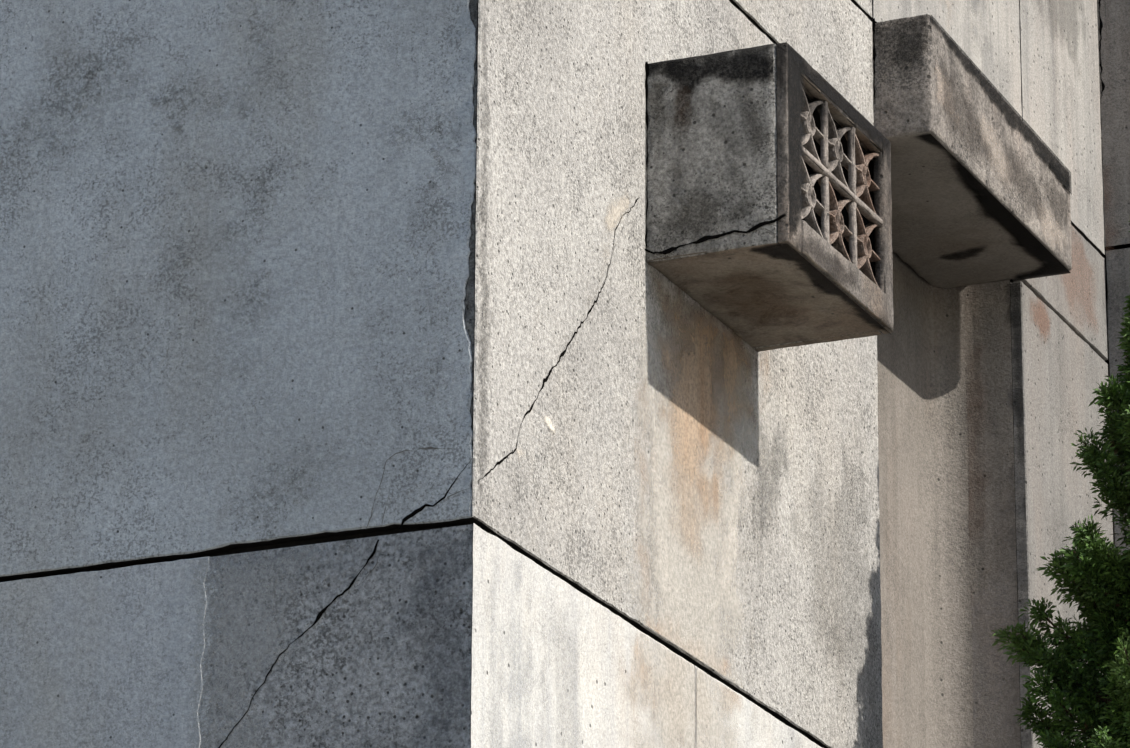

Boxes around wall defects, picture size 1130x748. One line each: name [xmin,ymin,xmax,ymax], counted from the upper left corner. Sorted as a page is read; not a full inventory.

crack [218,62,786,748]
water stain [649,52,774,126]
water stain [751,44,891,334]
water stain [874,14,1072,194]
water stain [917,134,1071,444]